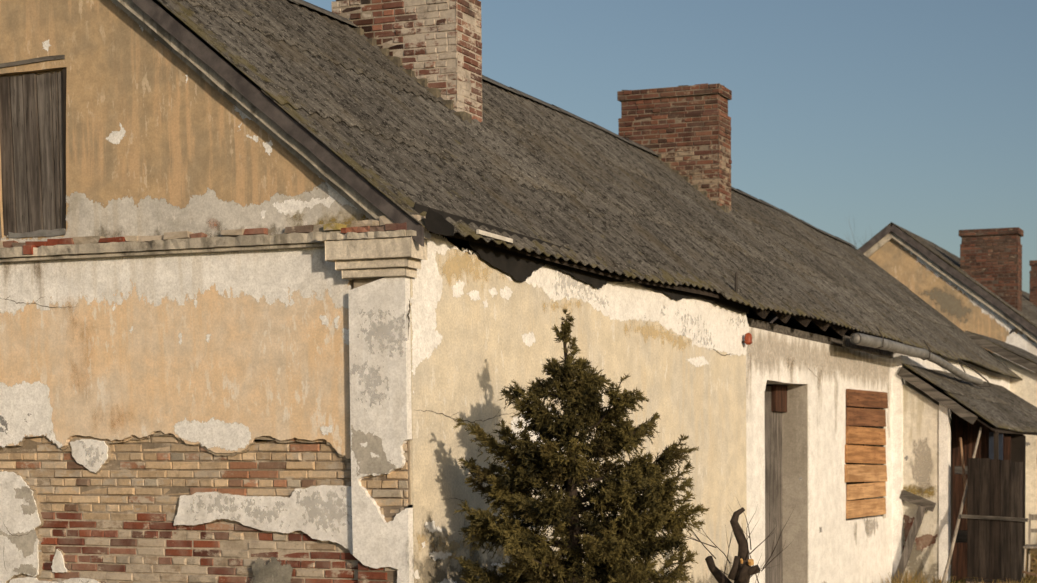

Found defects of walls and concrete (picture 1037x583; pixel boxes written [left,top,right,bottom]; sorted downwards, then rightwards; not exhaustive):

peeling [1,182,368,243]
peeling [0,247,381,345]
peeling [410,233,750,395]
crack [416,408,516,423]
spalling [0,381,411,583]
peeling [421,521,452,561]